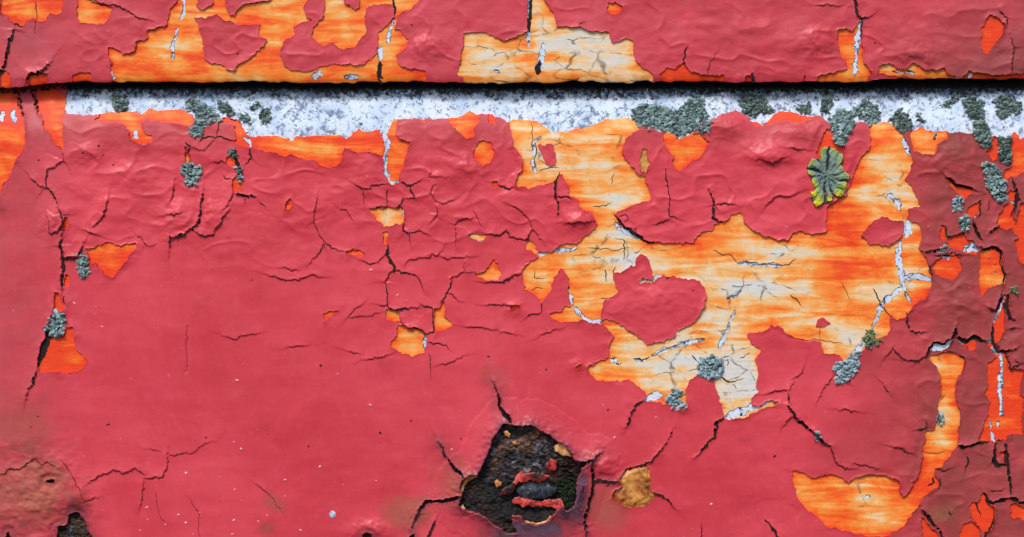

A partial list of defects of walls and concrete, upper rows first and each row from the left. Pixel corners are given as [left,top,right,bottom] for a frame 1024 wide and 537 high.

peeling [108,0,426,84]
peeling [457,0,724,84]
peeling [803,15,1024,83]
peeling [0,65,67,195]
peeling [95,108,194,144]
crack [27,161,108,395]
crack [276,175,556,379]
crack [531,123,677,299]
peeling [509,117,1024,537]
crack [873,178,1021,370]
crack [411,442,464,537]
crack [894,420,1024,537]